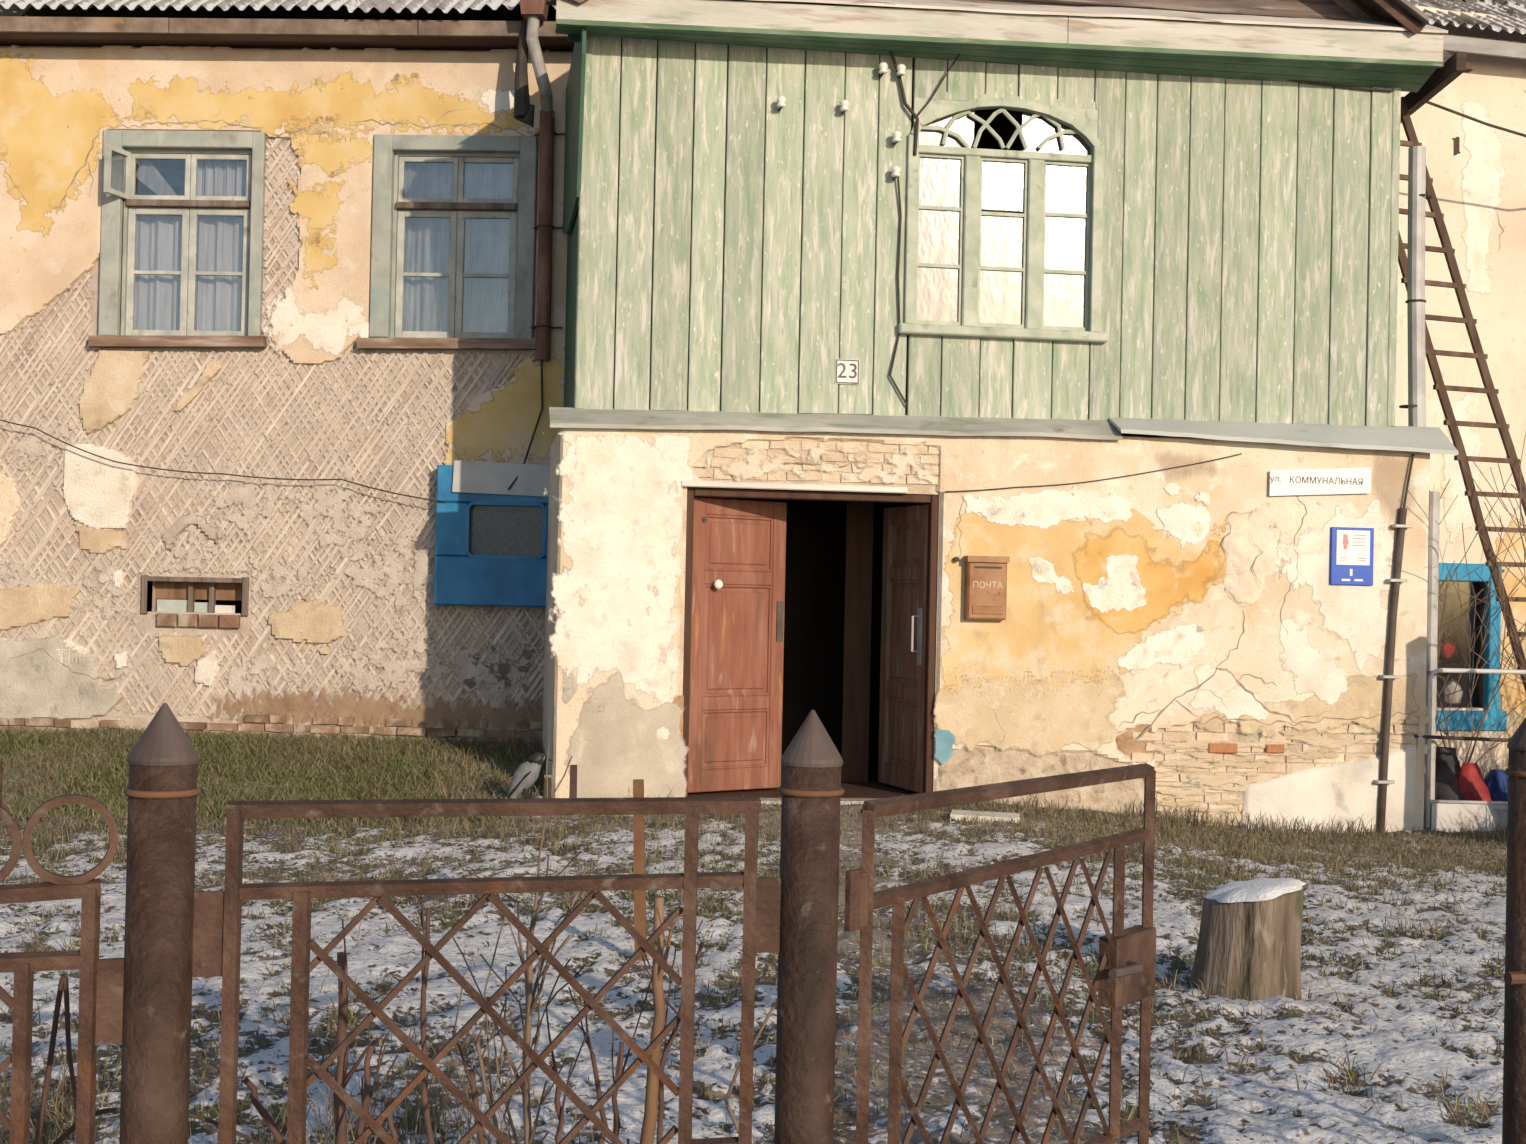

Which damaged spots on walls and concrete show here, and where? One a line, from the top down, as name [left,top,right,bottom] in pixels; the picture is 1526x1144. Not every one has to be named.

peeling [0,48,540,289]
peeling [1452,100,1507,295]
peeling [441,349,565,464]
flaking render [691,439,939,488]
spalling [672,695,684,740]
peeling [934,483,1432,826]
crack [1119,496,1416,739]
peeling [1488,519,1526,769]